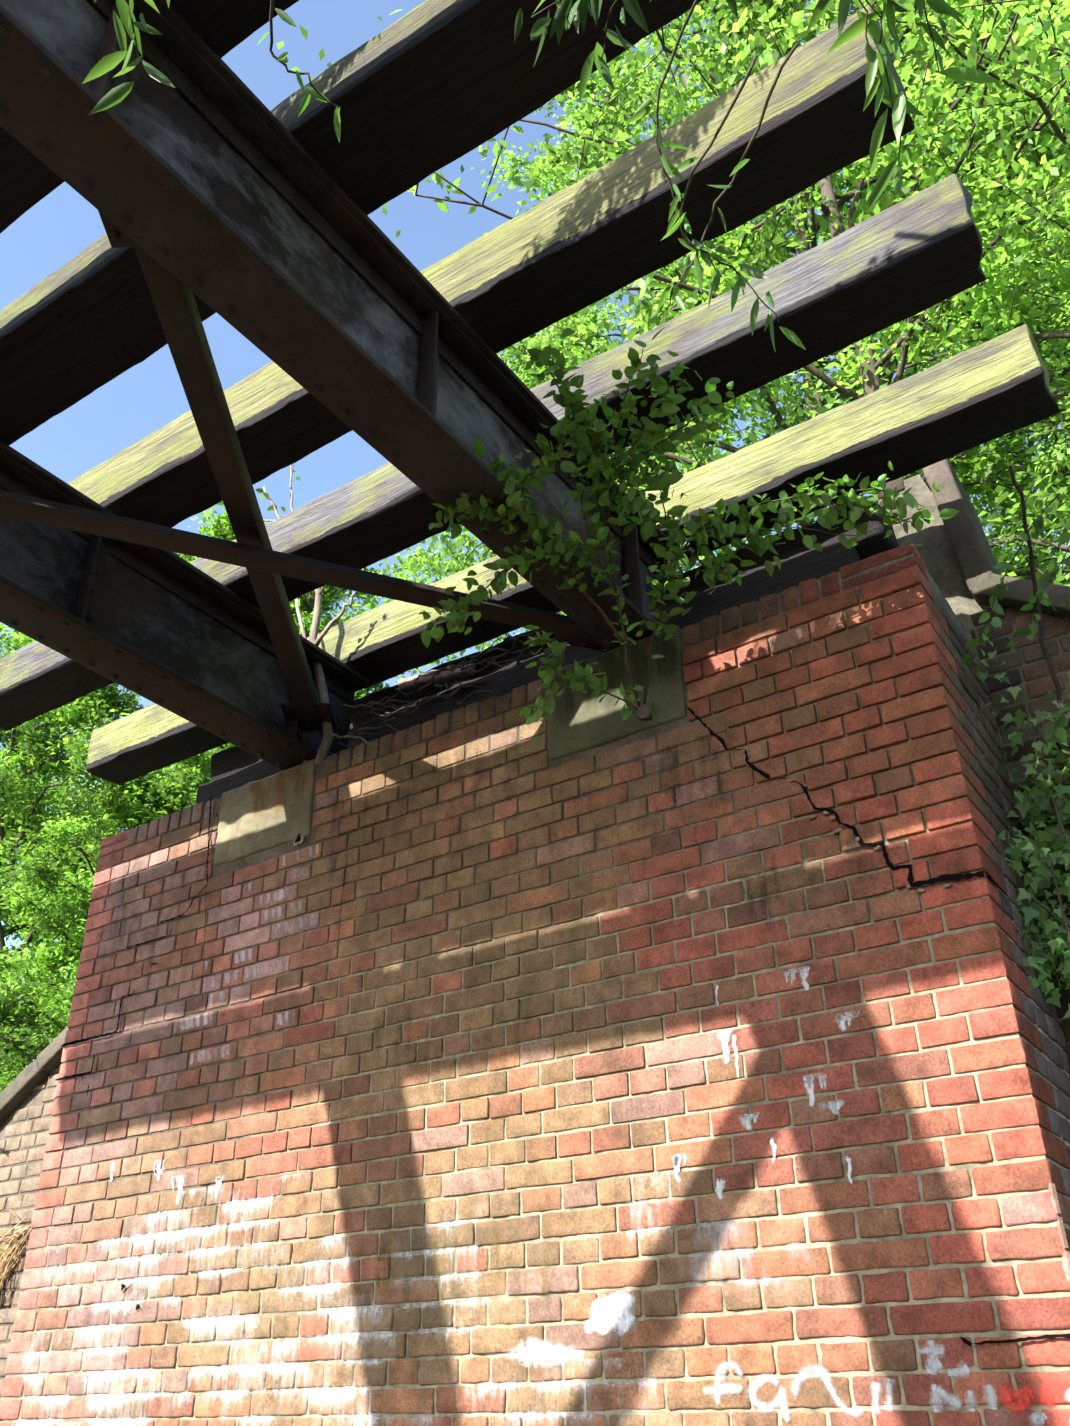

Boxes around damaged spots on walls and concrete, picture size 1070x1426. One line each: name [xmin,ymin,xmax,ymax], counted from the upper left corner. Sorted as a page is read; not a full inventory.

crack [685,706,1008,897]
crack [56,795,212,1094]
damp [786,966,809,991]
damp [718,1029,739,1077]
damp [803,1074,843,1115]
damp [740,1114,758,1130]
damp [673,1154,687,1182]
damp [715,1179,725,1200]
damp [117,1161,272,1288]
damp [286,1284,392,1344]
damp [585,1292,635,1335]
crack [961,1334,1070,1346]